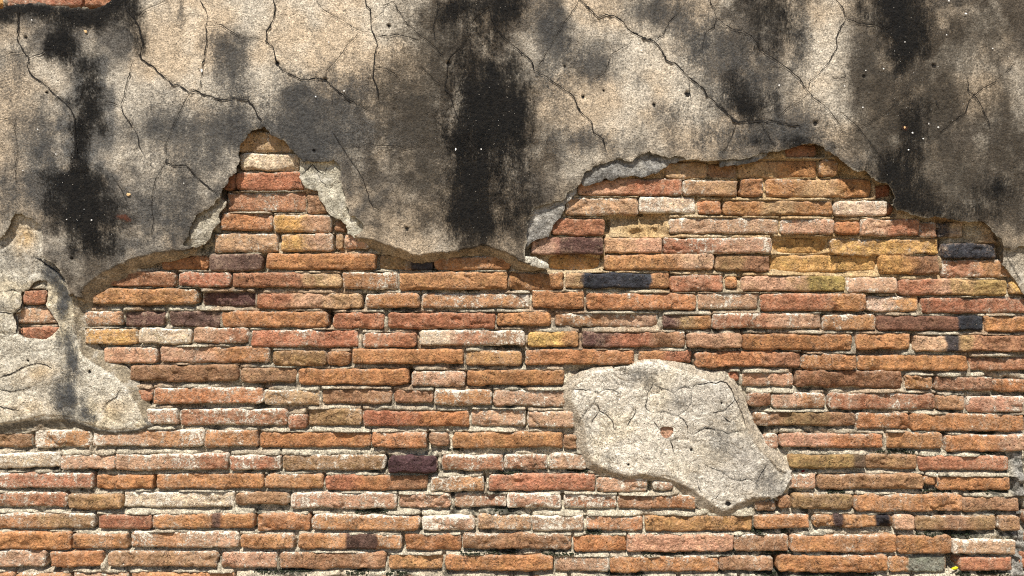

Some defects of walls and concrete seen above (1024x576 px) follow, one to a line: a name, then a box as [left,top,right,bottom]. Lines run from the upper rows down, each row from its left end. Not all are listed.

crack [2,11,78,160]
water stain [0,0,146,257]
water stain [131,0,615,249]
crack [108,0,1014,237]
water stain [838,0,1024,218]
spalling [183,193,228,254]
spalling [299,158,364,238]
spalling [525,151,686,270]
spalling [769,222,996,275]
crack [577,376,745,452]
spalling [660,427,673,438]
spalling [792,369,933,390]